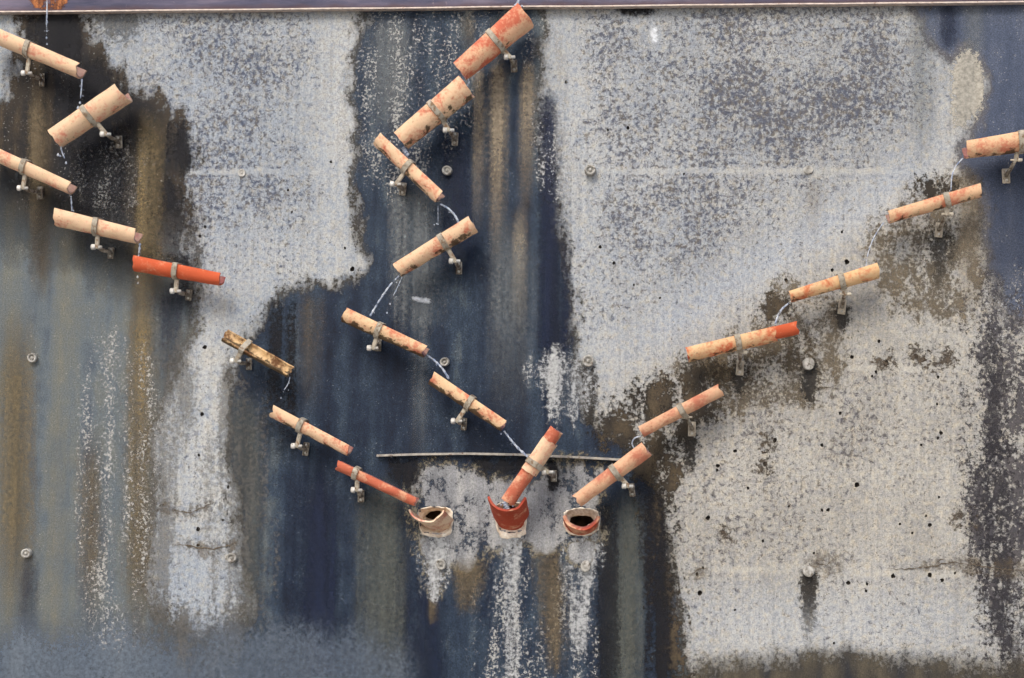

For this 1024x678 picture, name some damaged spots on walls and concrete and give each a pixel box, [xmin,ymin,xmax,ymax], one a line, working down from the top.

water stain [0,8,809,678]
water stain [692,5,1024,678]
crack [887,543,1024,571]